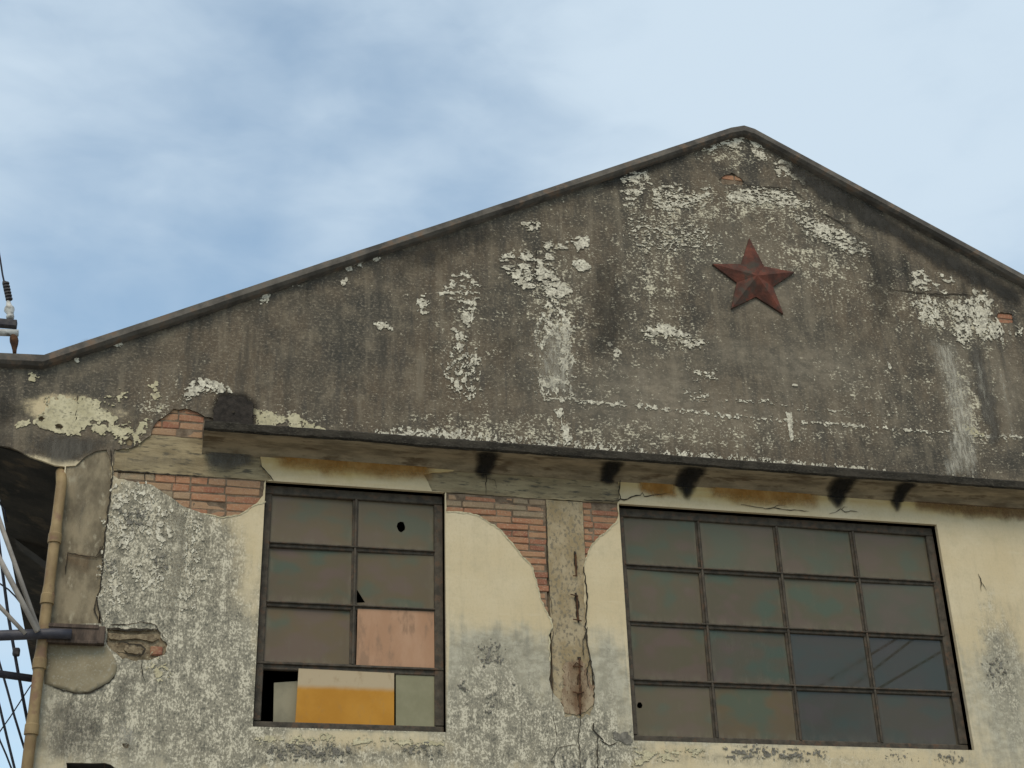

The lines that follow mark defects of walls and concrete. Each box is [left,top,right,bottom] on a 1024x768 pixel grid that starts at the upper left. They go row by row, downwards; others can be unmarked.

peeling [620,137,871,257]
peeling [375,219,886,471]
peeling [909,268,1023,348]
peeling [15,377,233,449]
water stain [213,392,254,424]
water stain [476,452,498,478]
water stain [676,467,705,498]
water stain [828,478,856,507]
water stain [891,483,916,510]
flaking render [96,472,266,682]
flaking render [446,493,553,661]
crack [546,508,617,768]